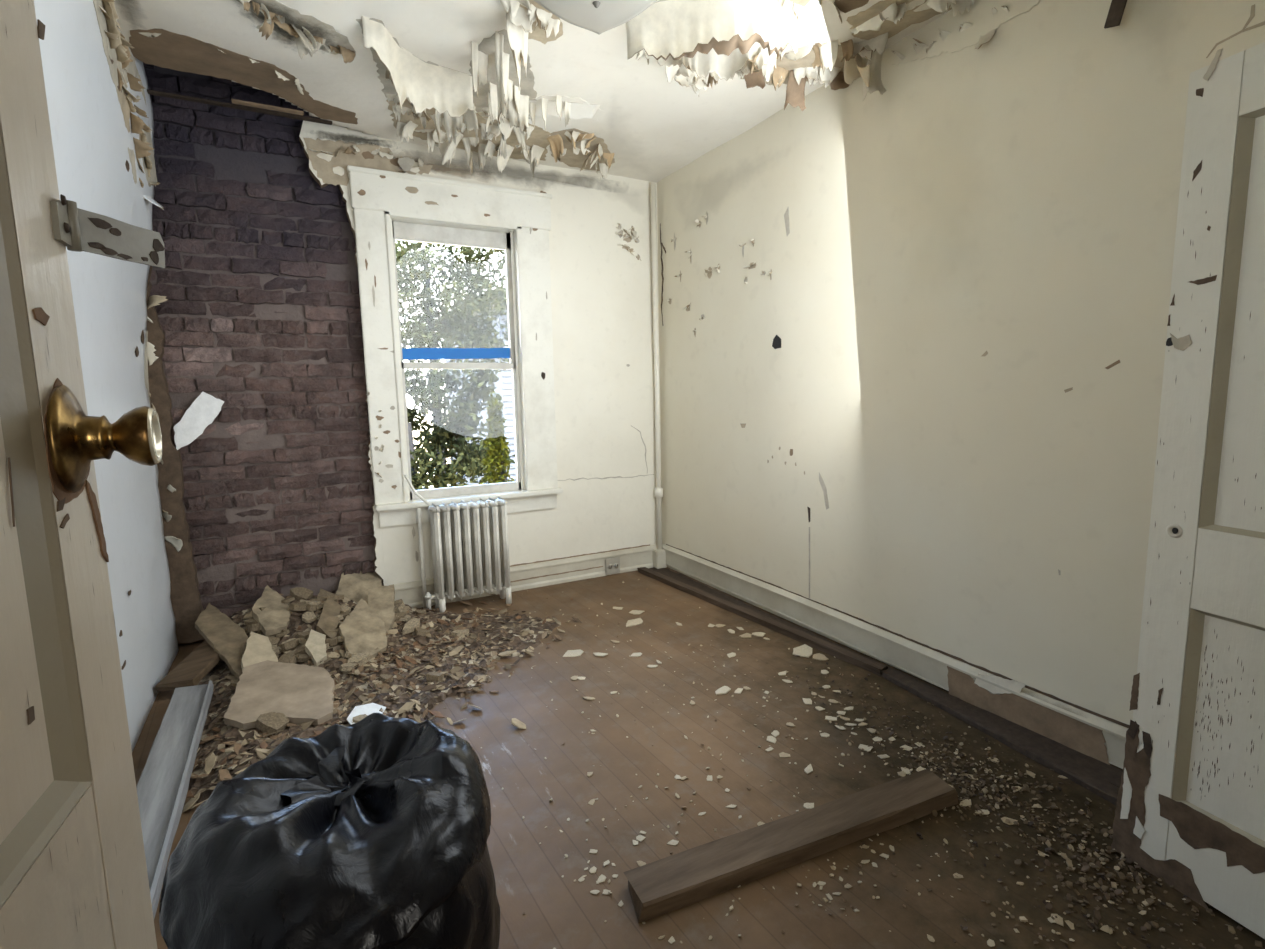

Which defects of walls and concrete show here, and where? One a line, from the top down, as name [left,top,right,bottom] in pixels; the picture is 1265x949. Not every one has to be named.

peeling [626,0,1040,111]
crack [1206,4,1265,58]
flaking render [87,0,615,644]
peeling [947,666,1265,908]